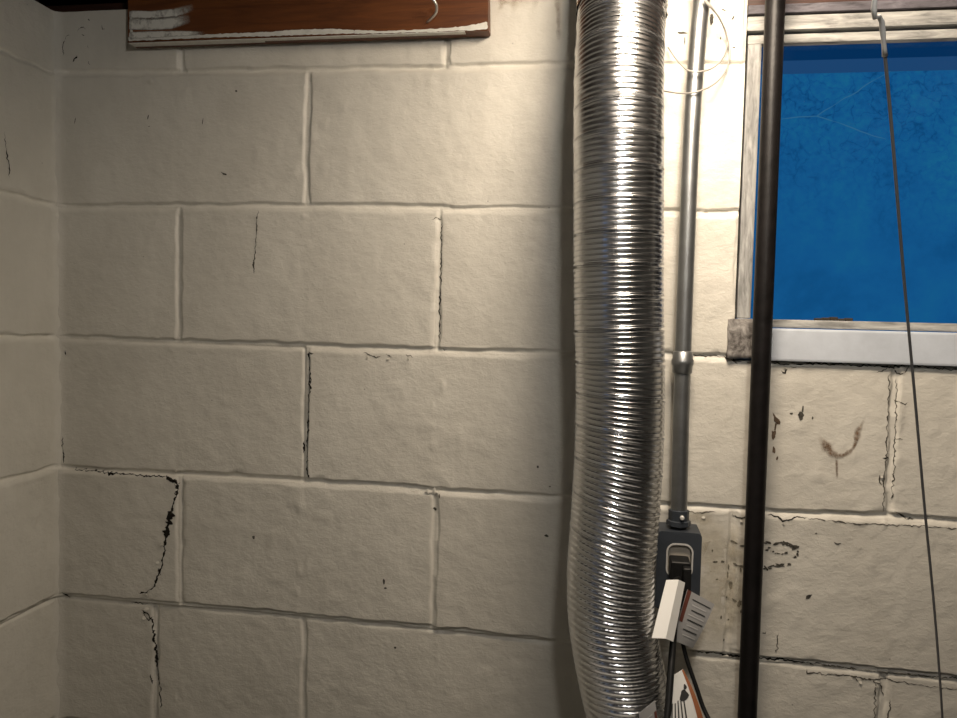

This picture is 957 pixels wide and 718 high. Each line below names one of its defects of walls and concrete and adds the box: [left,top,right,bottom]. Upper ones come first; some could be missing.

crack [431,217,447,351]
crack [303,352,313,478]
crack [769,362,957,530]
crack [61,439,180,707]
crack [689,511,745,522]
crack [690,650,957,718]